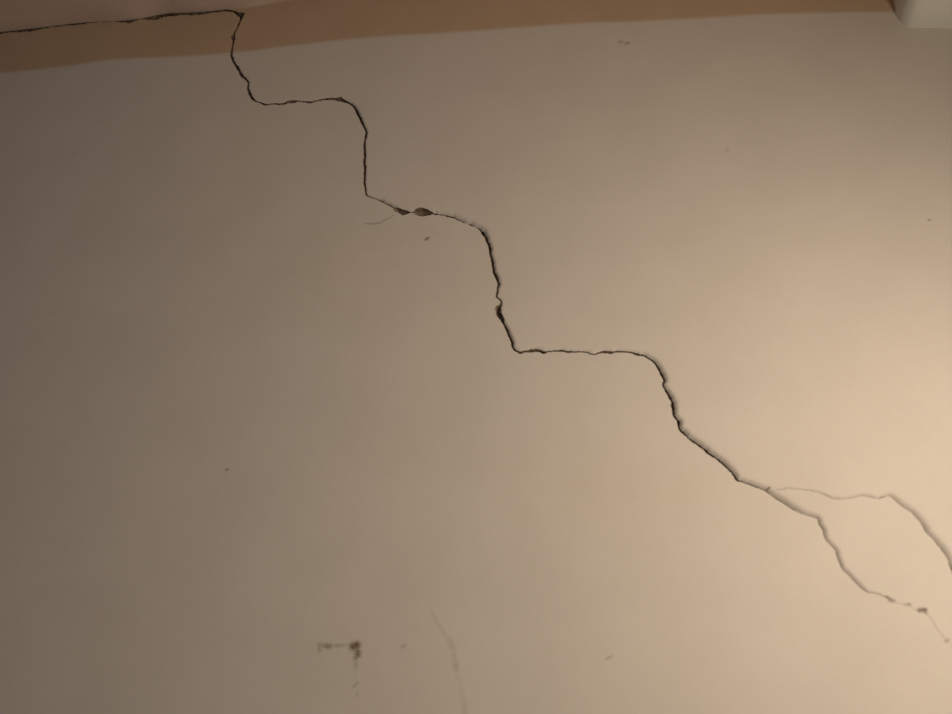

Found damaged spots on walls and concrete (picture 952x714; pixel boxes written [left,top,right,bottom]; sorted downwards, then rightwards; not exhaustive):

crack [0,10,841,567]